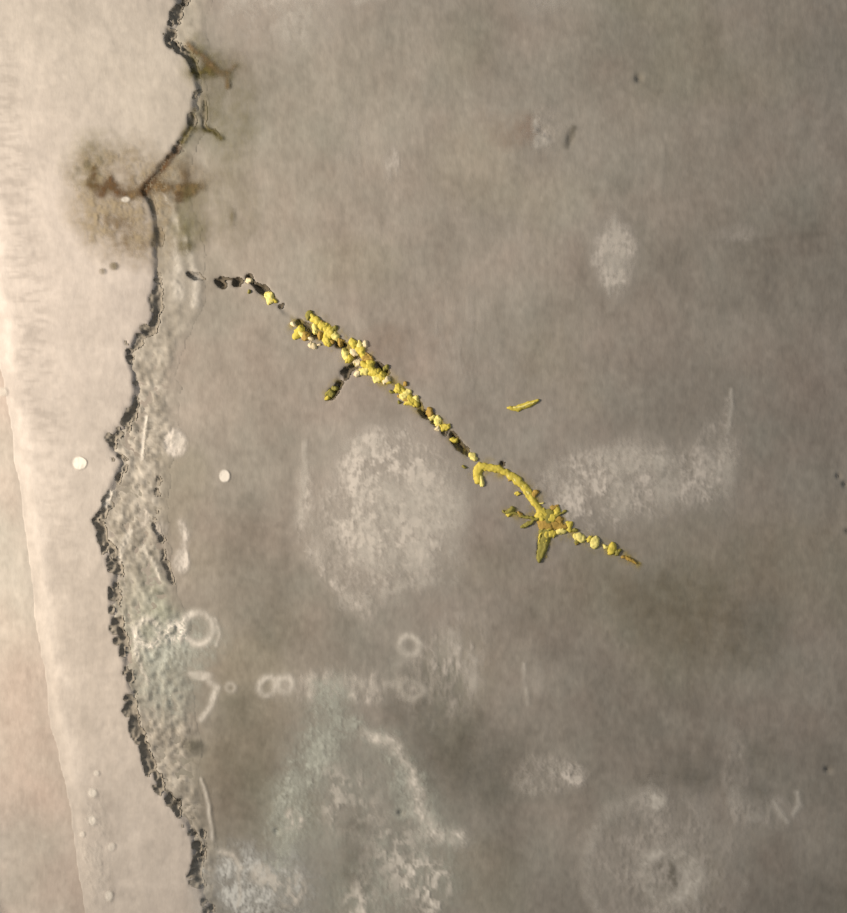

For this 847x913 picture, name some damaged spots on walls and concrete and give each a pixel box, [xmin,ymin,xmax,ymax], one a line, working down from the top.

crack [148,196,164,247]
crack [163,0,219,157]
damp [180,126,223,144]
crack [92,272,215,913]
spalling [99,0,223,913]
crack [186,271,640,565]